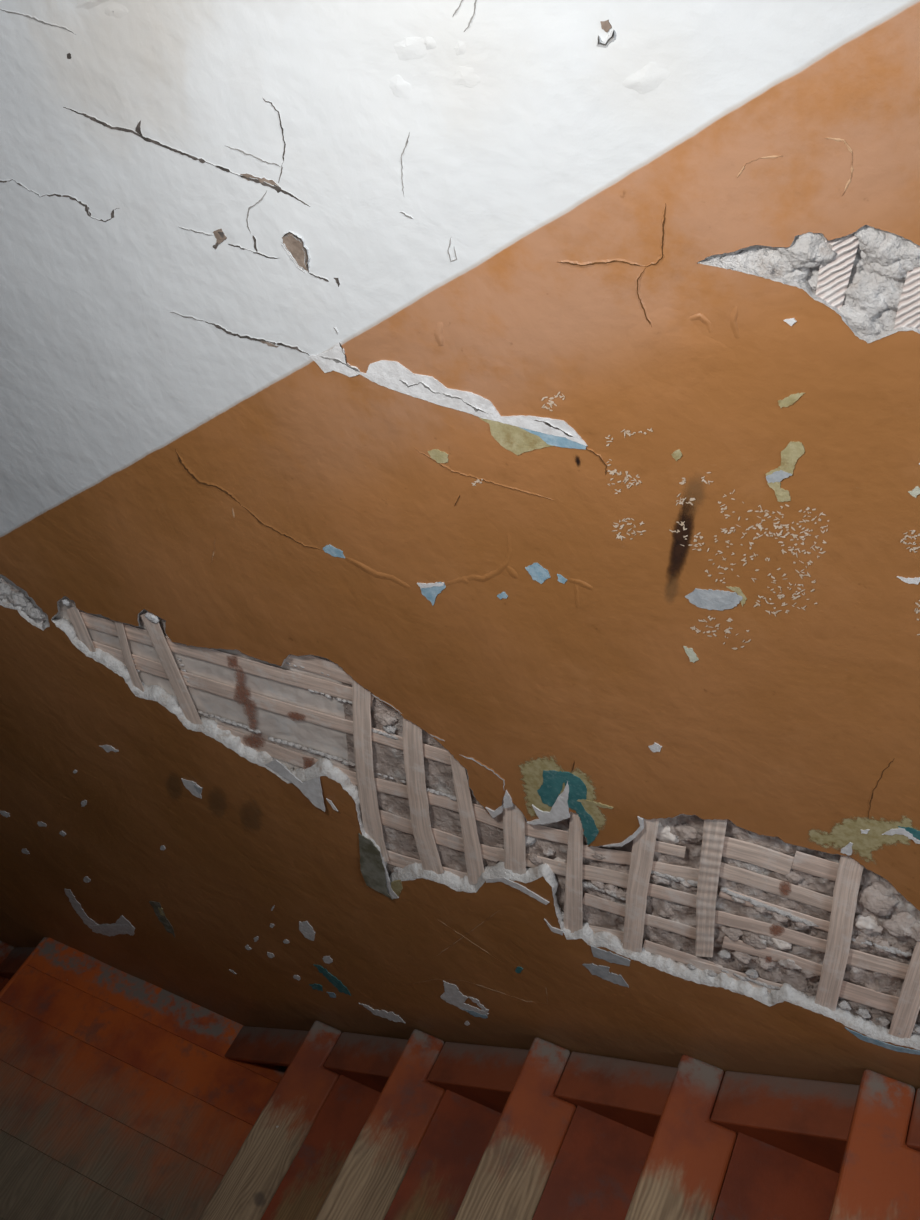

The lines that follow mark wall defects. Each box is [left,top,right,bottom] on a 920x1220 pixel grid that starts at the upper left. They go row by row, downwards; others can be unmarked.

crack [0,9,76,35]
crack [0,179,120,223]
crack [63,98,310,259]
crack [309,273,340,287]
crack [557,203,667,327]
flaking render [698,225,920,343]
flaking render [308,342,608,475]
peeling [766,441,805,502]
peeling [323,544,345,558]
peeling [525,563,567,584]
damp [668,505,692,576]
flaking render [0,574,920,1055]